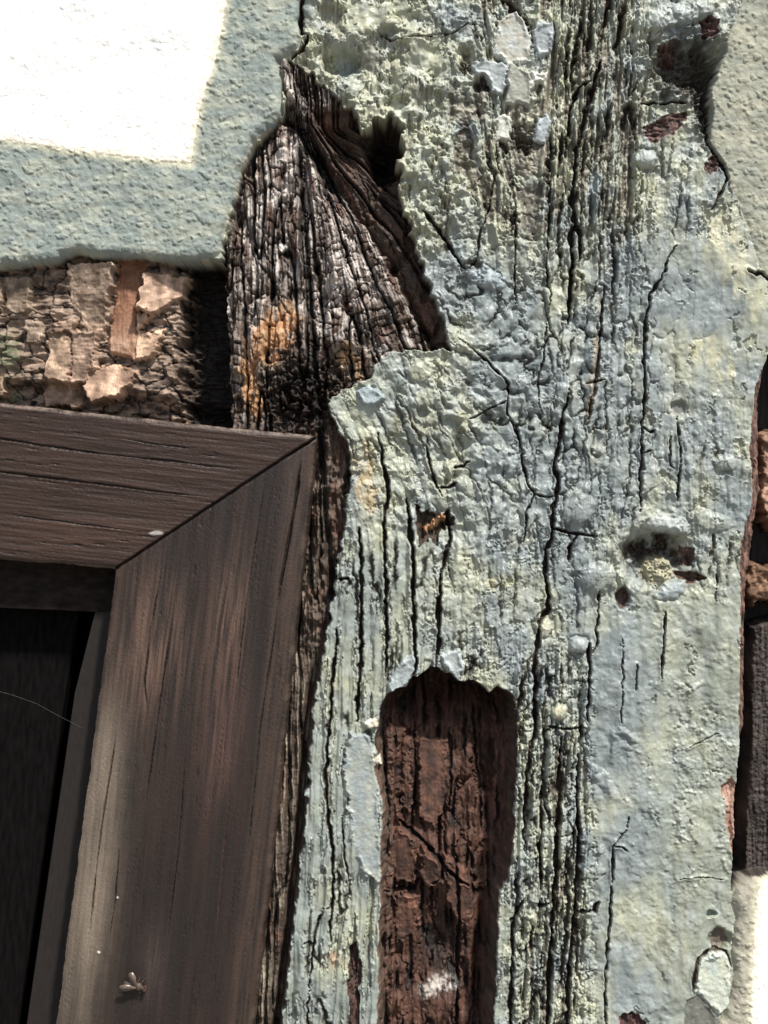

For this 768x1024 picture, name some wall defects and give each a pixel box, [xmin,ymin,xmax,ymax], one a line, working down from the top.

crack [639,73,731,215]
crack [422,172,519,305]
peeling [0,259,195,411]
crack [638,245,683,514]
peeling [416,500,456,548]
crack [458,60,667,1024]
peeling [672,545,707,584]
crack [302,431,471,1024]
peeling [387,653,421,692]
peeling [399,735,450,830]
peeling [386,825,476,944]
crack [691,945,733,995]